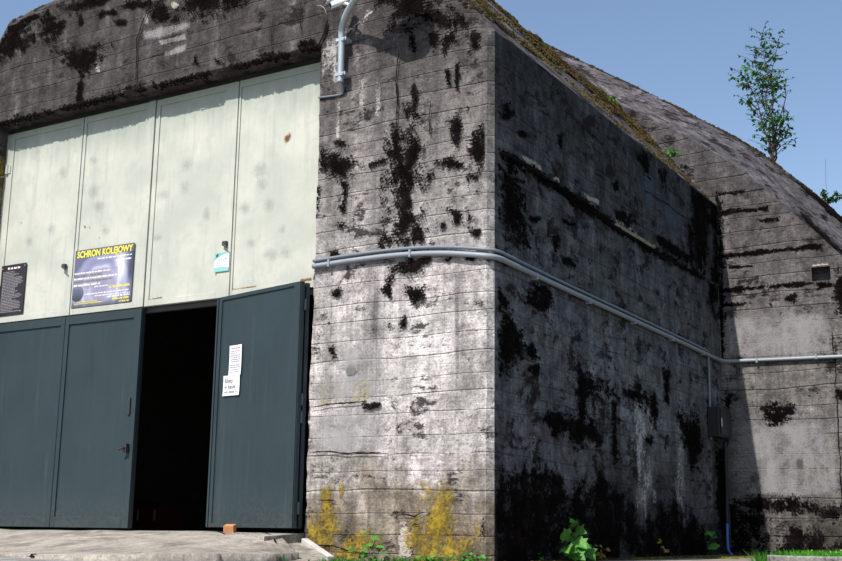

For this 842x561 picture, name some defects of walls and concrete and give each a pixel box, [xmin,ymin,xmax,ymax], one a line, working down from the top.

crack [313,400,364,408]
crack [310,448,381,456]